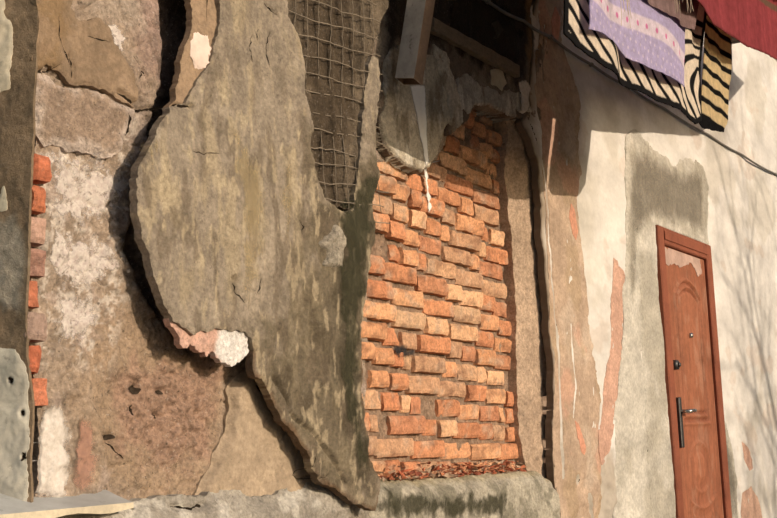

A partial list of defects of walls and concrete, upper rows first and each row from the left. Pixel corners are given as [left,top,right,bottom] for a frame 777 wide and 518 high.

flaking render [0,0,246,502]
spalling [287,0,389,210]
spalling [361,109,527,482]
peeling [534,0,625,518]
peeling [742,442,753,471]
peeling [741,486,762,518]